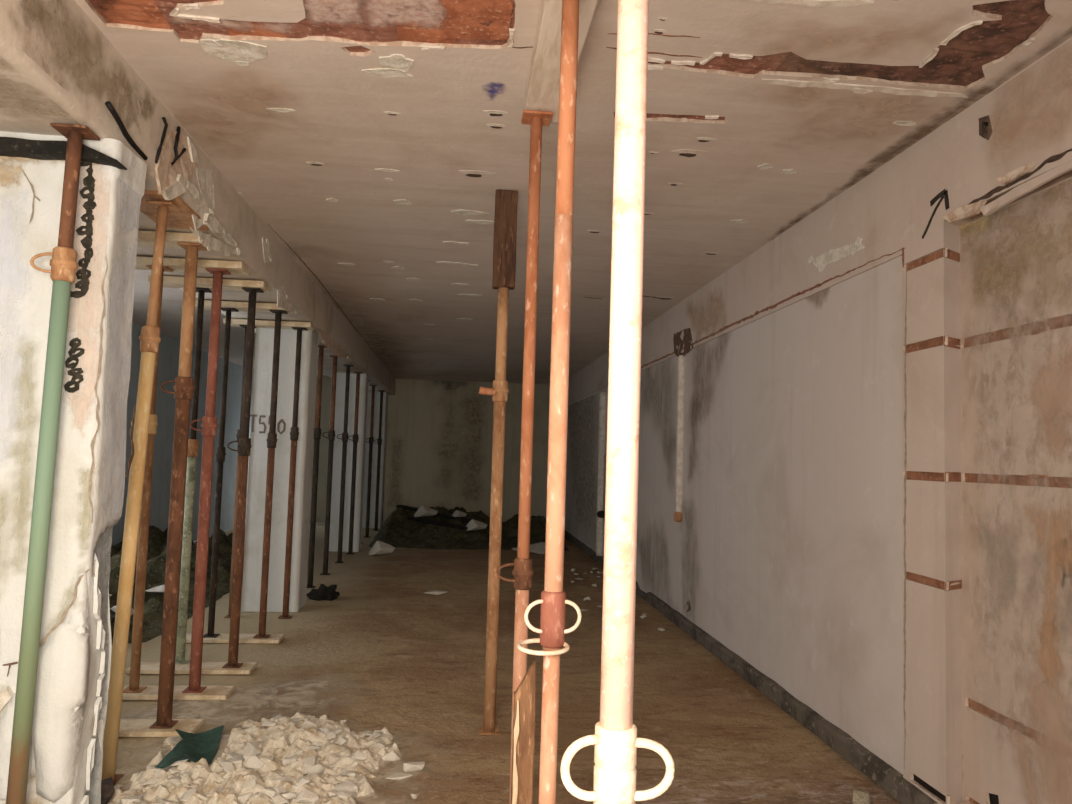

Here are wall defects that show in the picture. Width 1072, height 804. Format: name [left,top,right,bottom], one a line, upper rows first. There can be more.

damp [25,0,152,124]
flaking render [89,0,516,77]
flaking render [648,0,1050,98]
damp [0,156,38,185]
damp [0,348,33,563]
flaking render [80,521,120,804]